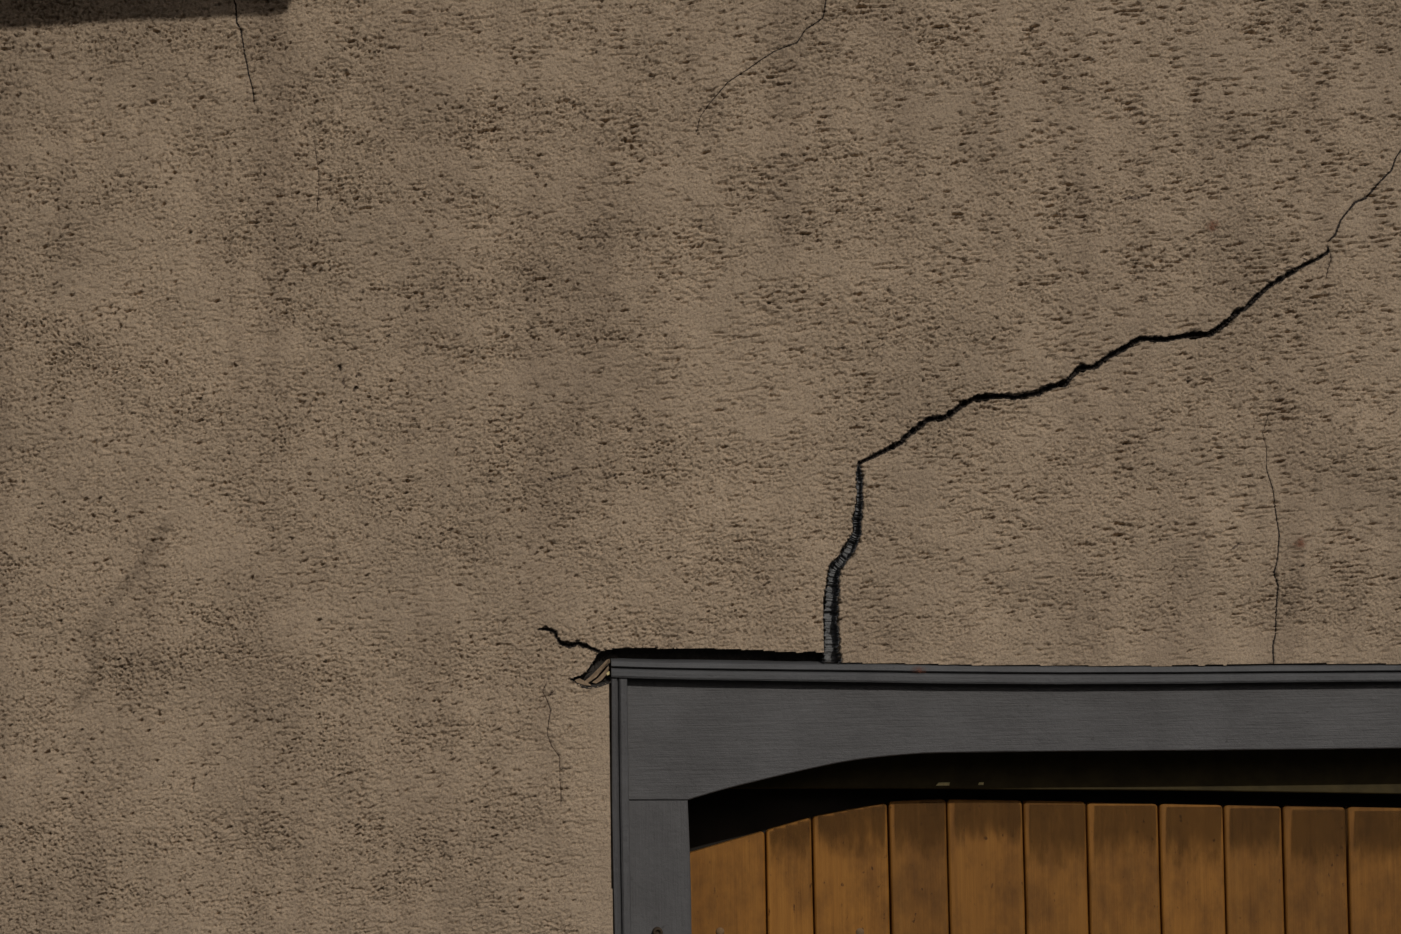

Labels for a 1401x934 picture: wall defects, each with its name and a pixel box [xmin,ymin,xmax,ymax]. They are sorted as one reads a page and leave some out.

crack [822,149,1401,665]
crack [538,627,602,653]
crack [542,682,571,790]